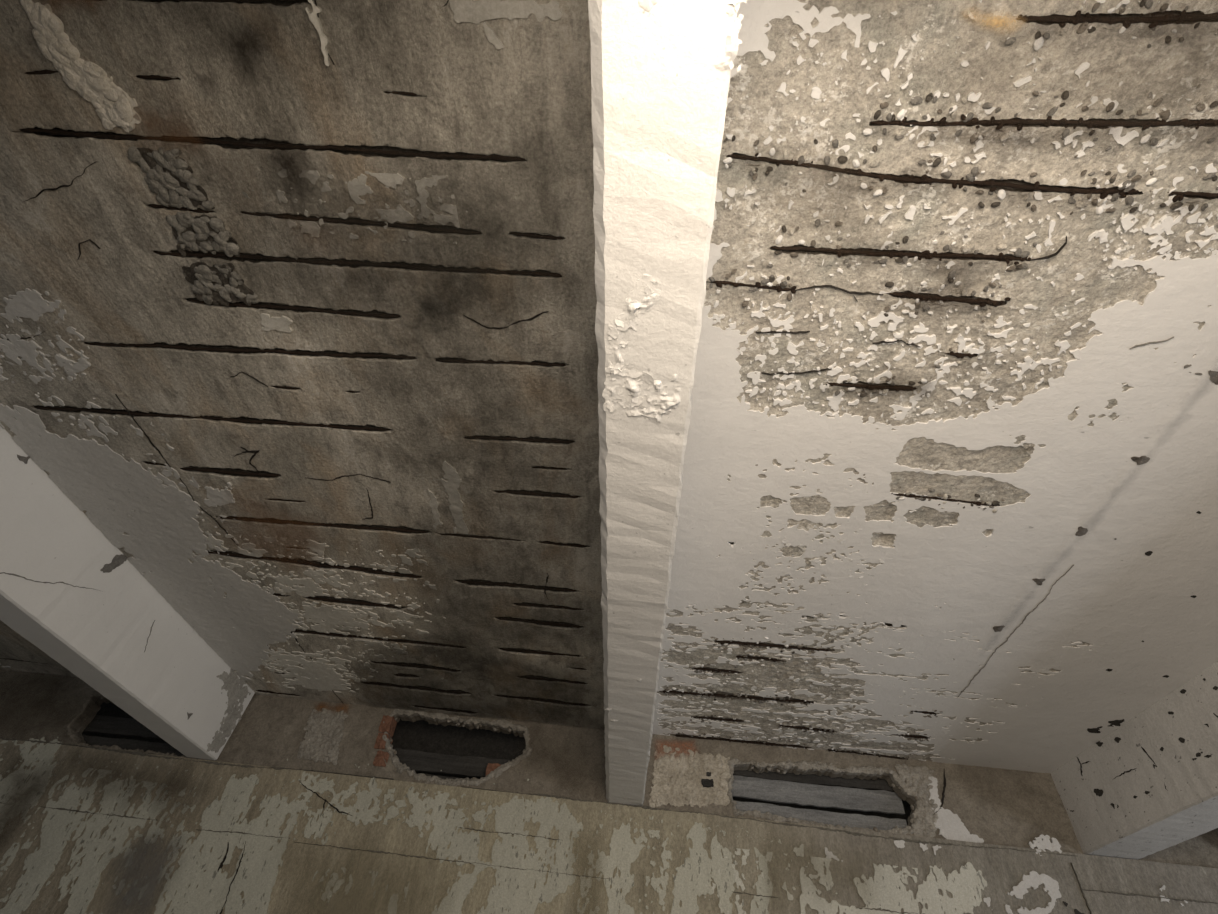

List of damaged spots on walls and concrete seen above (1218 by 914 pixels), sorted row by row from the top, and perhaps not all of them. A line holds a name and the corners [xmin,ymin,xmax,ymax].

crack [1030,236,1067,261]
crack [795,285,883,302]
crack [464,311,549,330]
spalling [435,358,566,367]
peeling [602,274,687,425]
spalling [657,0,1218,761]
crack [115,394,238,545]
peeling [0,288,523,753]
crack [305,474,391,519]
spalling [455,579,584,628]
crack [957,564,1074,698]
peeling [1028,834,1062,856]